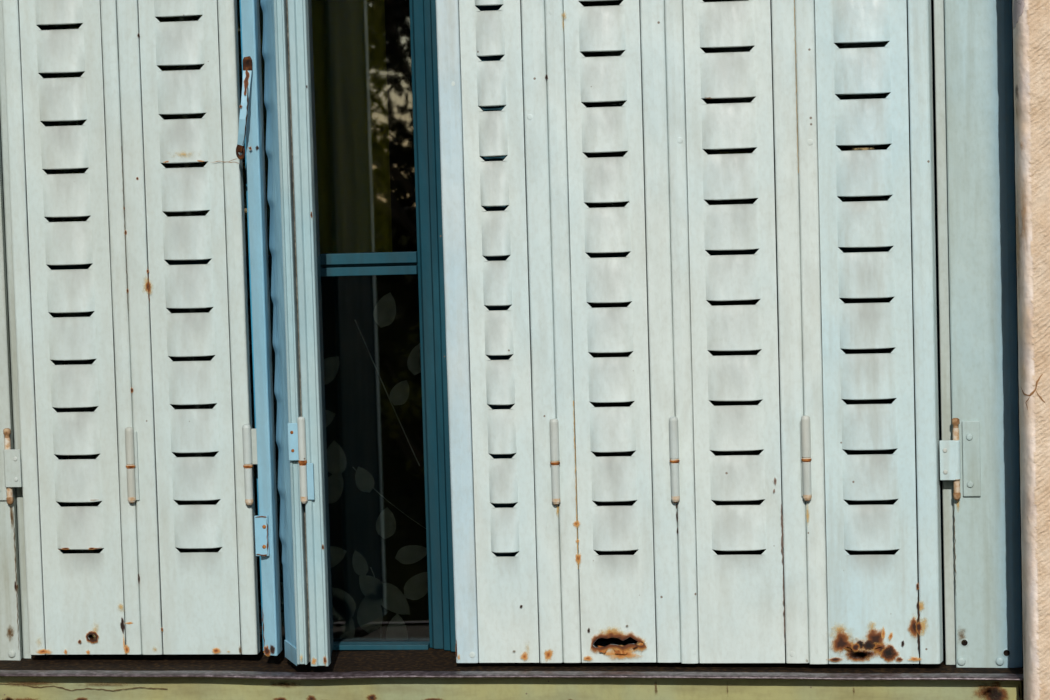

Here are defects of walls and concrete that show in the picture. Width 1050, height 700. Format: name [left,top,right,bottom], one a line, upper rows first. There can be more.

peeling [1012,0,1024,28]
rust [239,67,259,150]
rust [829,583,926,662]